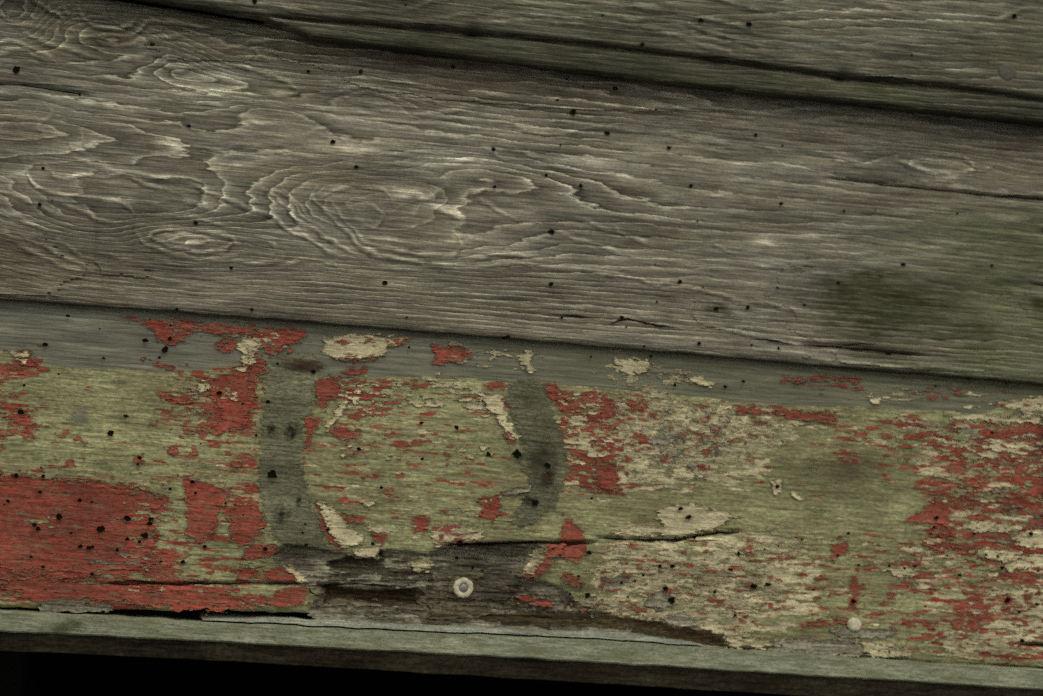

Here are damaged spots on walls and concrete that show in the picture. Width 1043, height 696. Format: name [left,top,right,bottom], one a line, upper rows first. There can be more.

peeling [121,315,308,470]
peeling [303,333,545,474]
peeling [0,344,310,616]
spalling [322,586,420,608]
peeling [315,484,533,574]
crack [437,531,746,546]
spalling [478,348,1043,665]